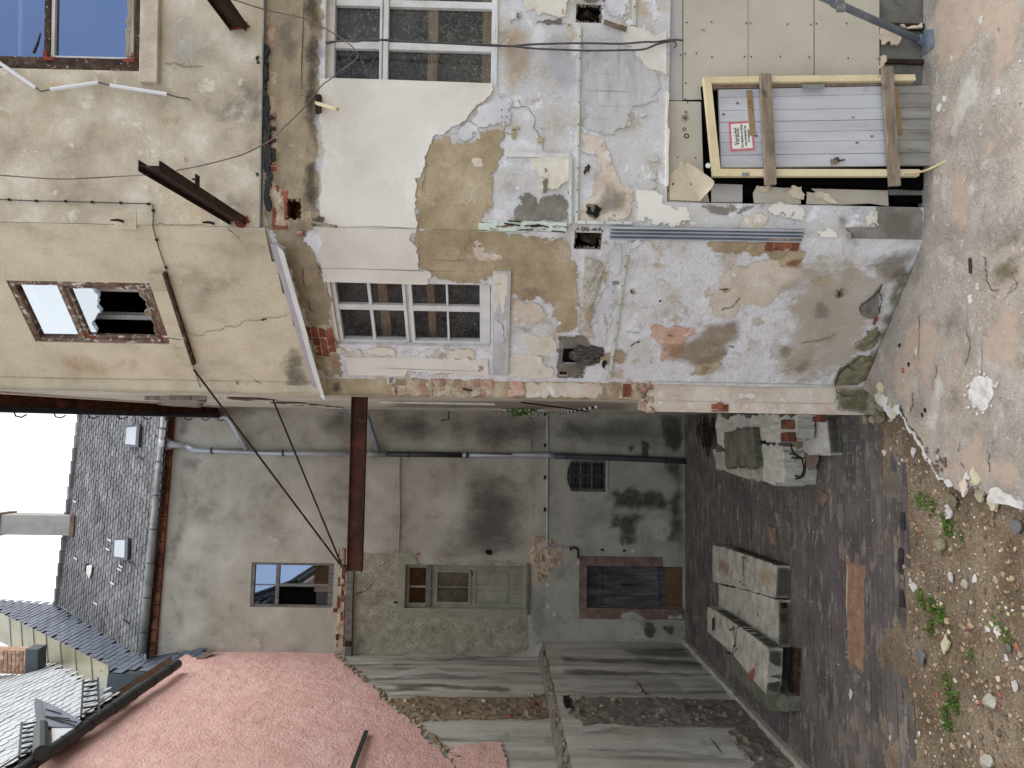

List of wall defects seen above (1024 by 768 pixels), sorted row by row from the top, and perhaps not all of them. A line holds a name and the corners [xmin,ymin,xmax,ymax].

peeling [263,0,695,413]
flaking render [702,202,844,321]
crack [167,316,281,349]
flaking render [691,346,734,376]
spalling [834,285,882,385]
leakage [611,489,670,544]
flaking render [527,536,563,583]